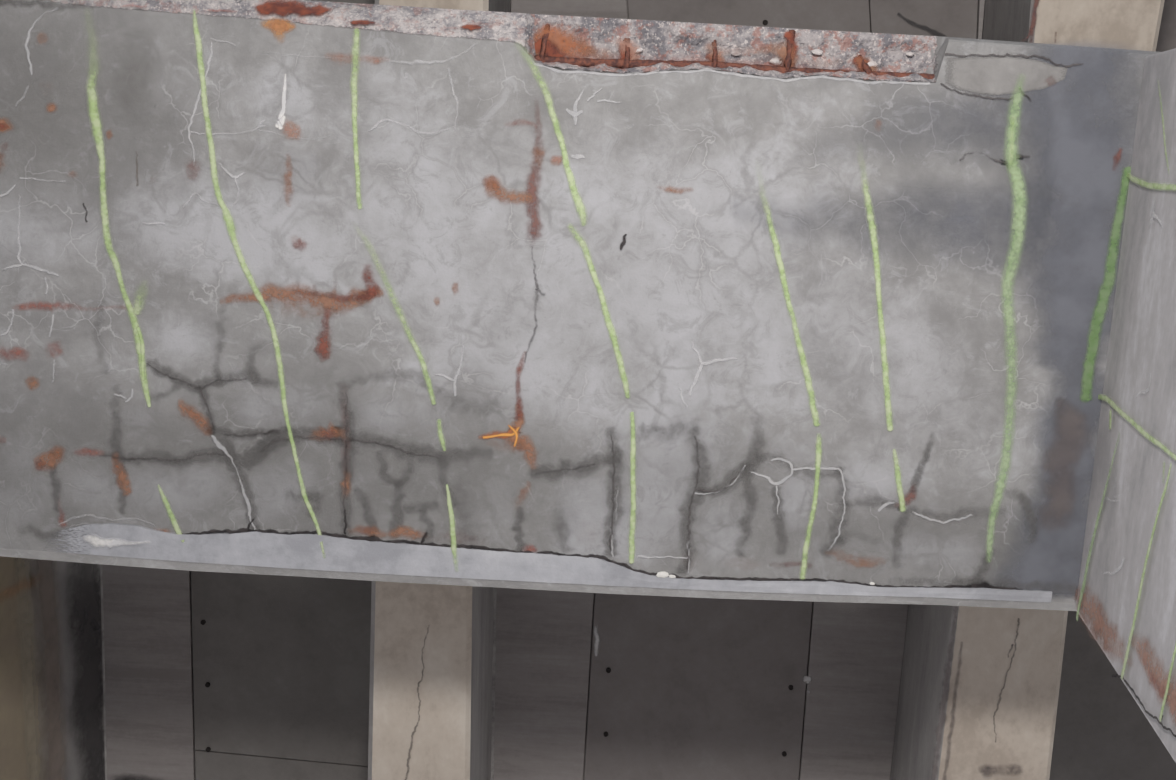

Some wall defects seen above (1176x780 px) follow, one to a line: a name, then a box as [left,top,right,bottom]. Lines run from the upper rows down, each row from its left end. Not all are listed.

rust [265,19,294,35]
spalling [48,0,938,84]
rust [487,150,562,238]
rust [227,270,382,358]
crack [156,370,246,405]
crack [438,359,462,396]
crack [679,348,729,405]
crack [112,416,1023,590]
damp [0,556,105,780]
crack [405,638,426,780]
crack [993,618,1020,742]
rust [1137,642,1176,723]